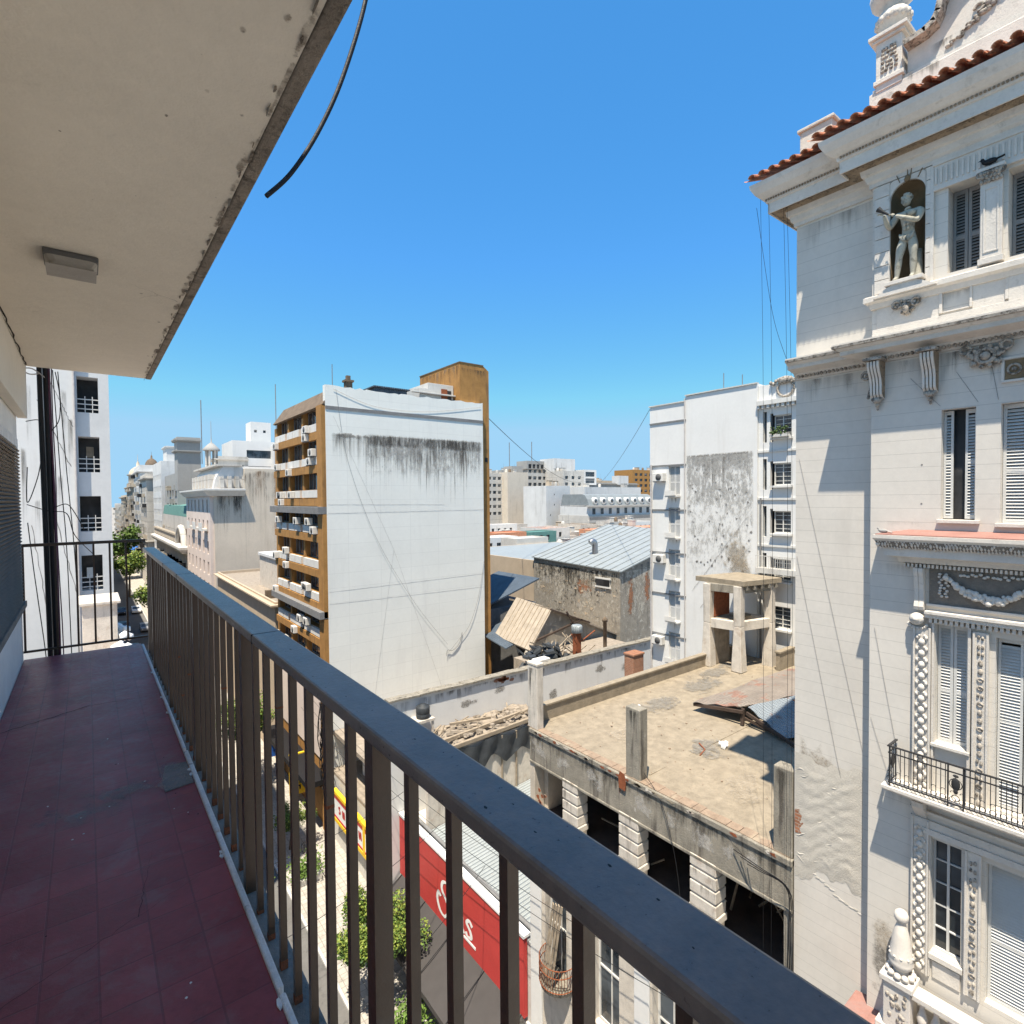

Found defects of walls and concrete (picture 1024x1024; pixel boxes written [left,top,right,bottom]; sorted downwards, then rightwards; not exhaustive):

leakage [687,451,752,556]
flaking render [536,563,650,625]
flaking render [795,809,803,833]